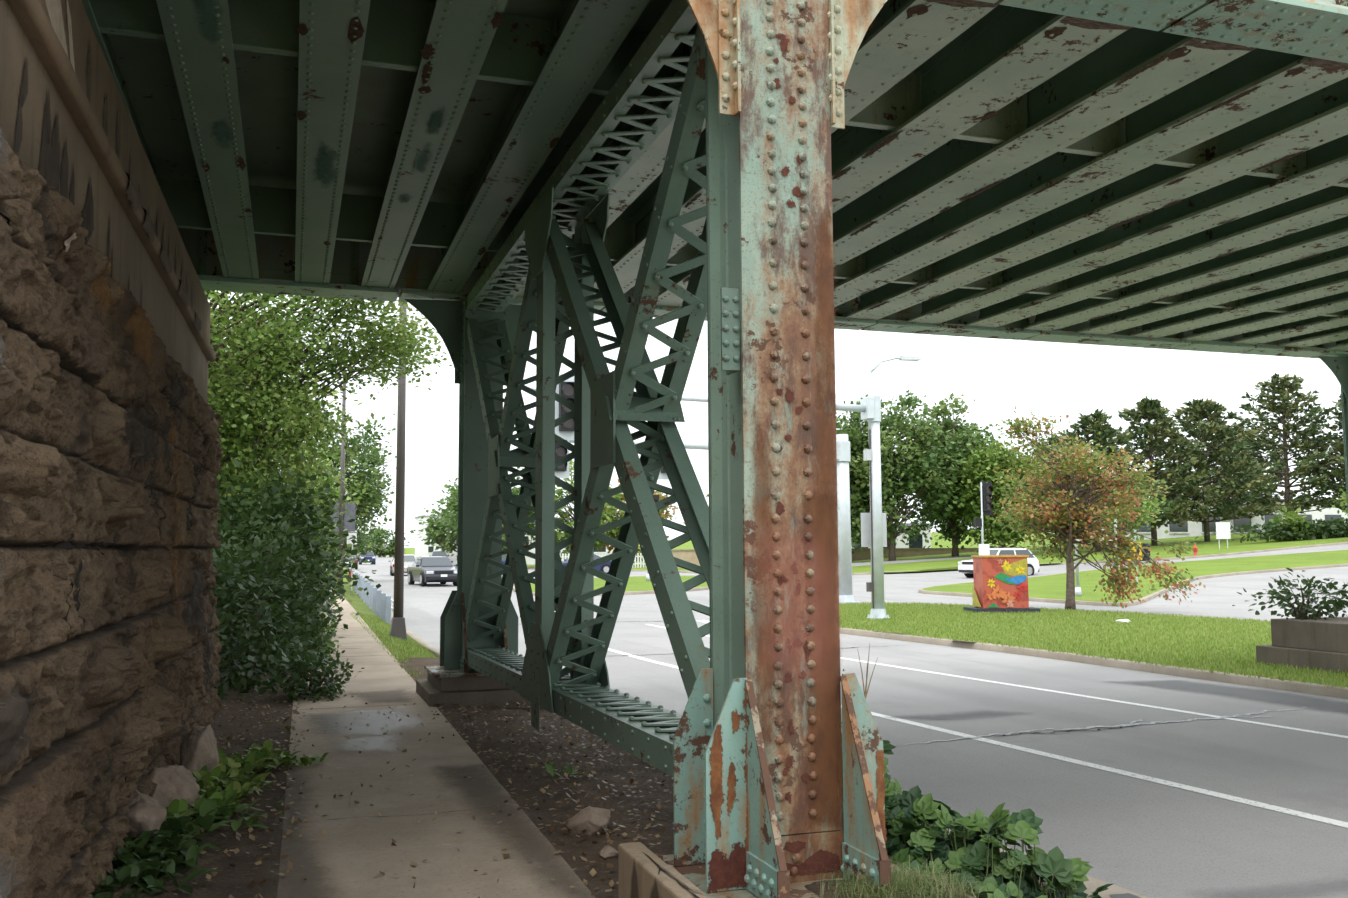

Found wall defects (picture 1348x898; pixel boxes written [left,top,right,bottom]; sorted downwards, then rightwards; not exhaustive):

rust [348,17,364,43]
rust [418,44,436,94]
rust [773,33,796,105]
rust [1158,85,1264,134]
rust [781,155,804,208]
rust [776,388,803,414]
rust [785,639,811,683]
rust [782,754,810,784]